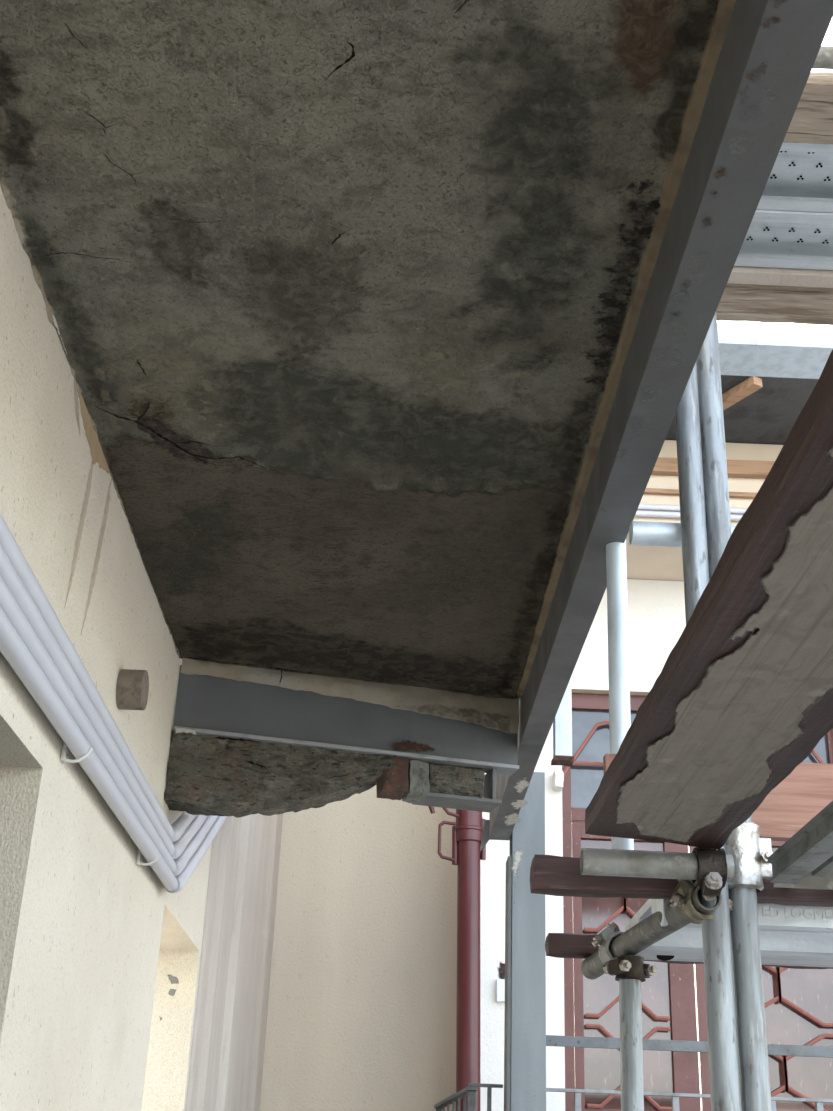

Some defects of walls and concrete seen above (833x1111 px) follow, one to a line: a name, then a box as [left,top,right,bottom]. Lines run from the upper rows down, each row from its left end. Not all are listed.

leakage [0,52,34,169]
crack [325,42,355,81]
crack [97,360,283,474]
leakage [17,26,661,695]